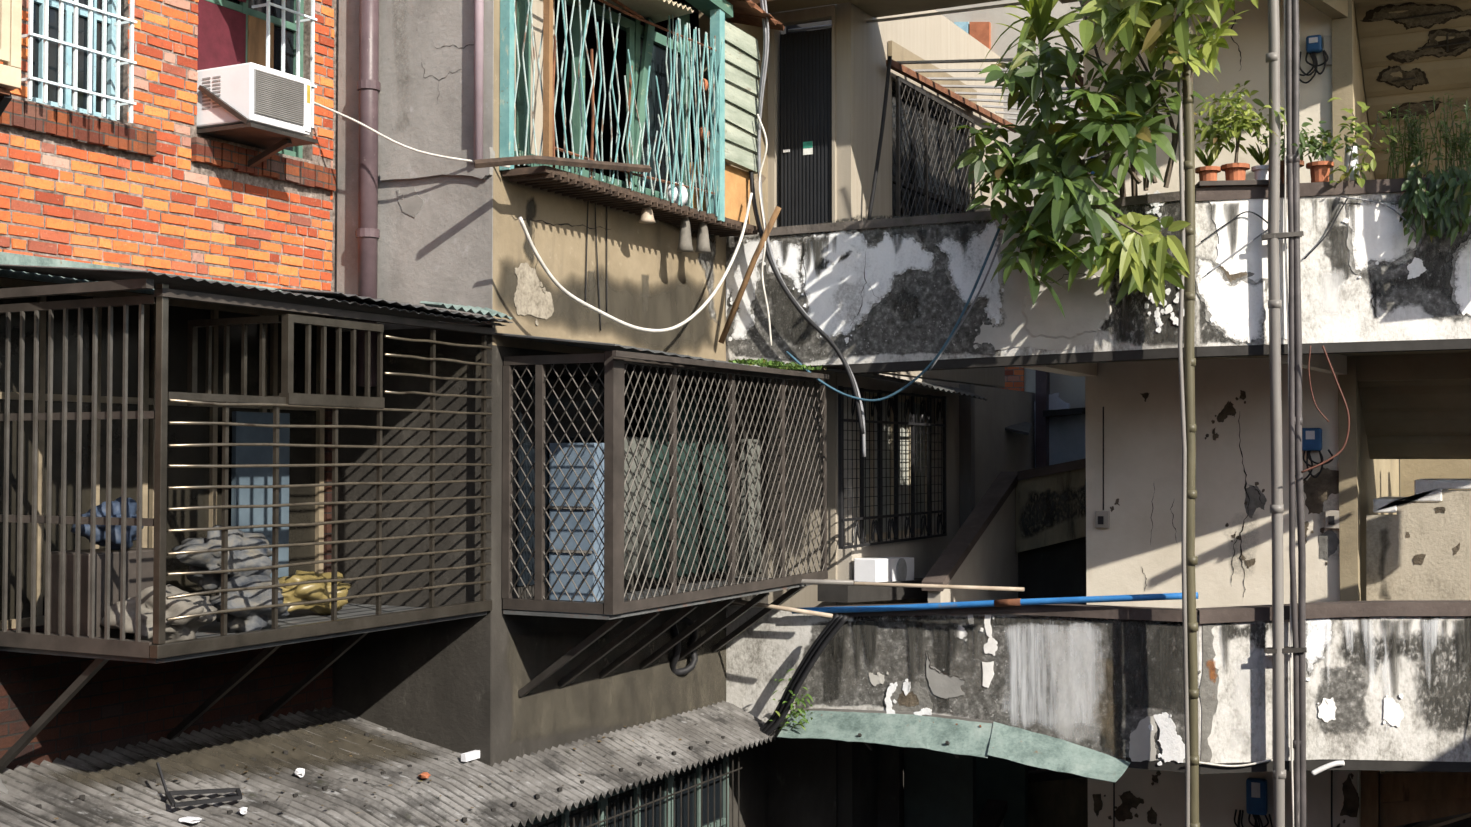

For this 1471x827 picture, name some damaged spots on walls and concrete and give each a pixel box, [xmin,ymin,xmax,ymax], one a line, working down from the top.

spalling [1360,2,1471,119]
peeling [514,263,554,326]
leakage [498,198,1001,363]
peeling [726,218,1112,351]
peeling [1342,200,1427,279]
peeling [1450,234,1471,317]
crack [1231,415,1262,597]
peeling [1303,467,1340,565]
leakage [796,615,1185,760]
peeling [1092,623,1219,826]
leakage [1316,616,1471,734]